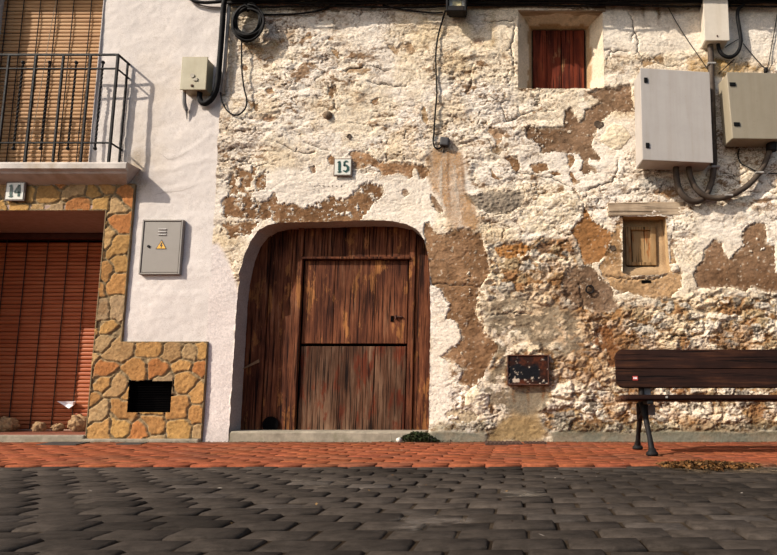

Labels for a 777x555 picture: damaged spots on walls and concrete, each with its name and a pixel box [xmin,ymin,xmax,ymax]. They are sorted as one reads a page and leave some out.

flaking render [220,164,385,239]
flaking render [349,151,430,180]
flaking render [487,128,520,173]
flaking render [526,84,635,185]
flaking render [561,208,683,314]
flaking render [693,223,777,293]
flaking render [424,222,556,388]